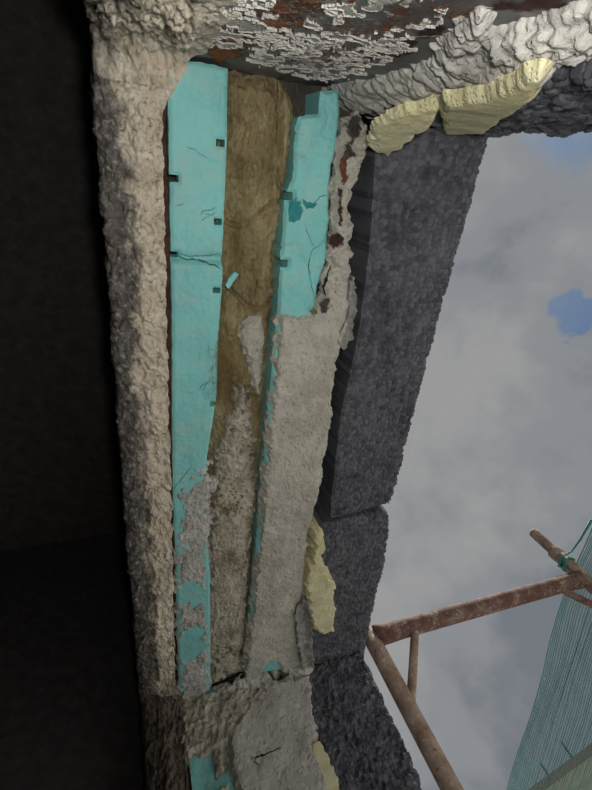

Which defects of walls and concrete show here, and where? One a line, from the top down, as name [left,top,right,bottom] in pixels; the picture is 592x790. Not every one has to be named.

rust [206,30,264,63]
peeling [207,0,436,81]
rust [256,0,566,68]
crack [205,672,245,694]
crack [251,747,282,765]